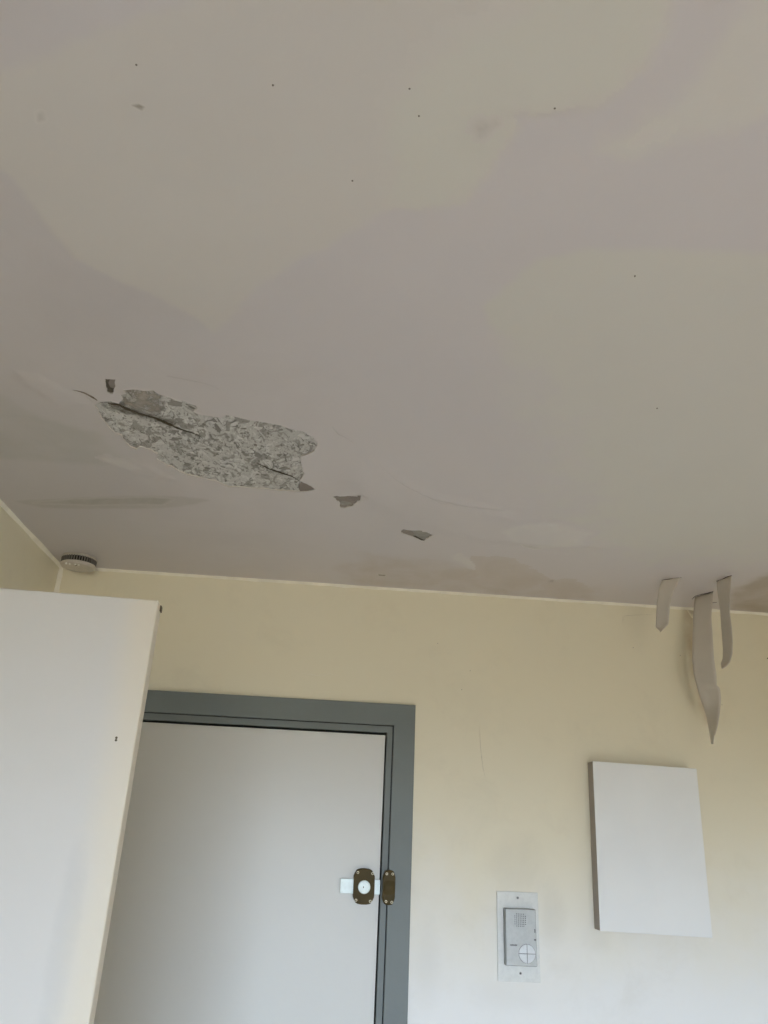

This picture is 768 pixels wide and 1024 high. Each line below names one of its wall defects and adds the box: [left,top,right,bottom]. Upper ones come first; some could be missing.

peeling [93,378,320,493]
peeling [332,495,361,508]
peeling [400,529,433,541]
peeling [656,577,682,632]
peeling [692,575,733,744]